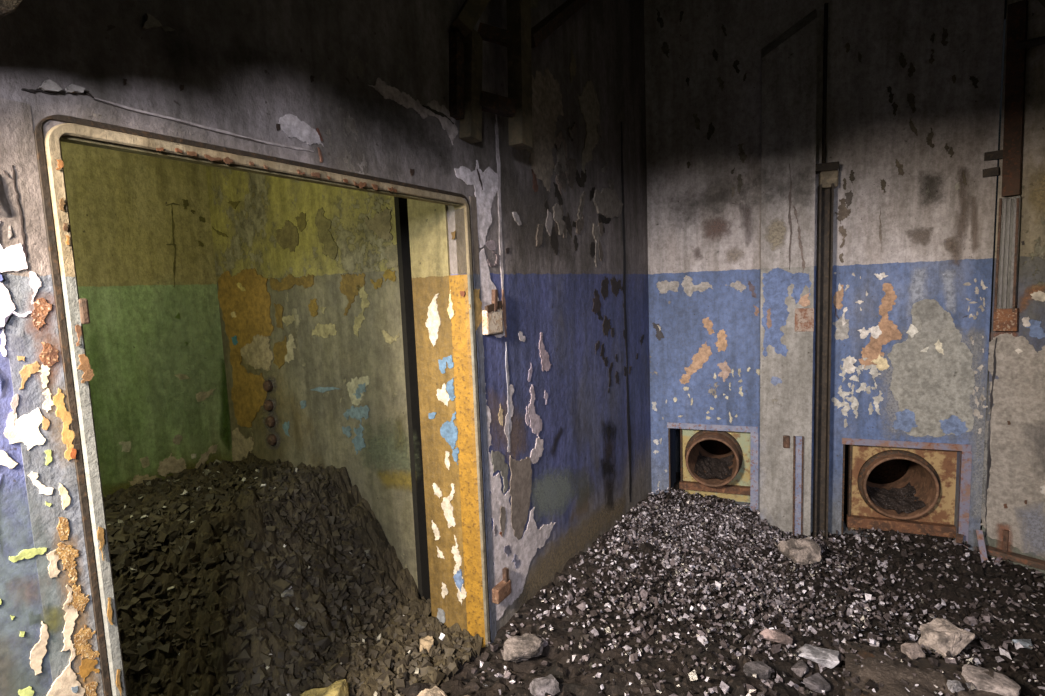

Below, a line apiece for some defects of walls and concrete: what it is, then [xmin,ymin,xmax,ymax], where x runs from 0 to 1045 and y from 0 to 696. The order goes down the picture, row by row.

peeling [425,160,510,347]
damp [767,221,786,250]
damp [908,228,931,245]
damp [921,176,940,200]
damp [945,169,977,263]
peeling [0,244,77,510]
corrosion [31,298,59,412]
corrosion [75,324,94,383]
peeling [831,170,1045,559]
peeling [488,332,555,621]
corrosion [97,527,105,561]
corrosion [54,517,100,696]